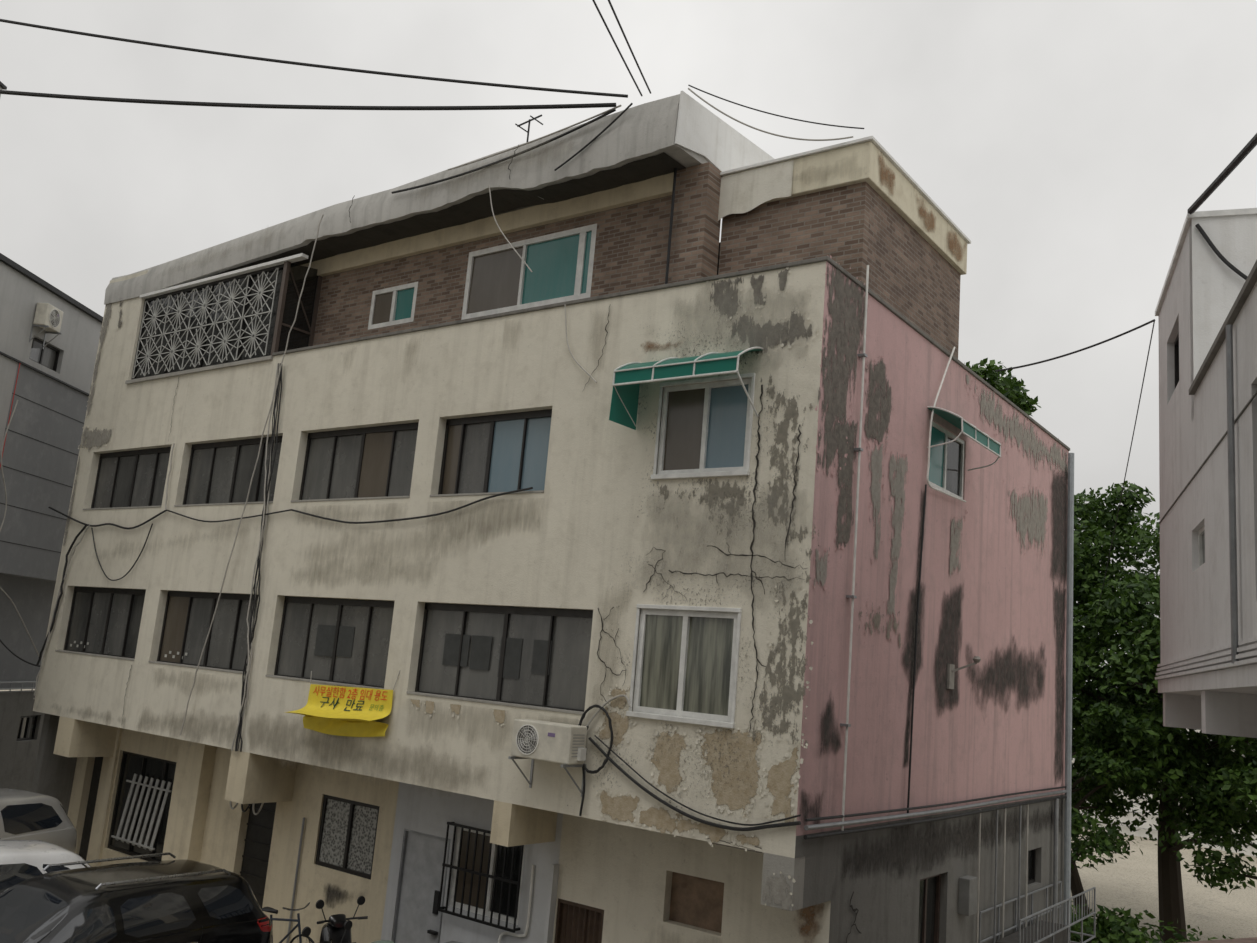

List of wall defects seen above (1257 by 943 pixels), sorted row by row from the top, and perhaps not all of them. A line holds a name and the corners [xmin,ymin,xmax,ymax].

crack [643,385,807,732]
peeling [706,255,908,648]
peeling [1004,480,1049,559]
crack [597,607,626,704]
peeling [594,679,808,853]
water stain [844,806,1062,875]